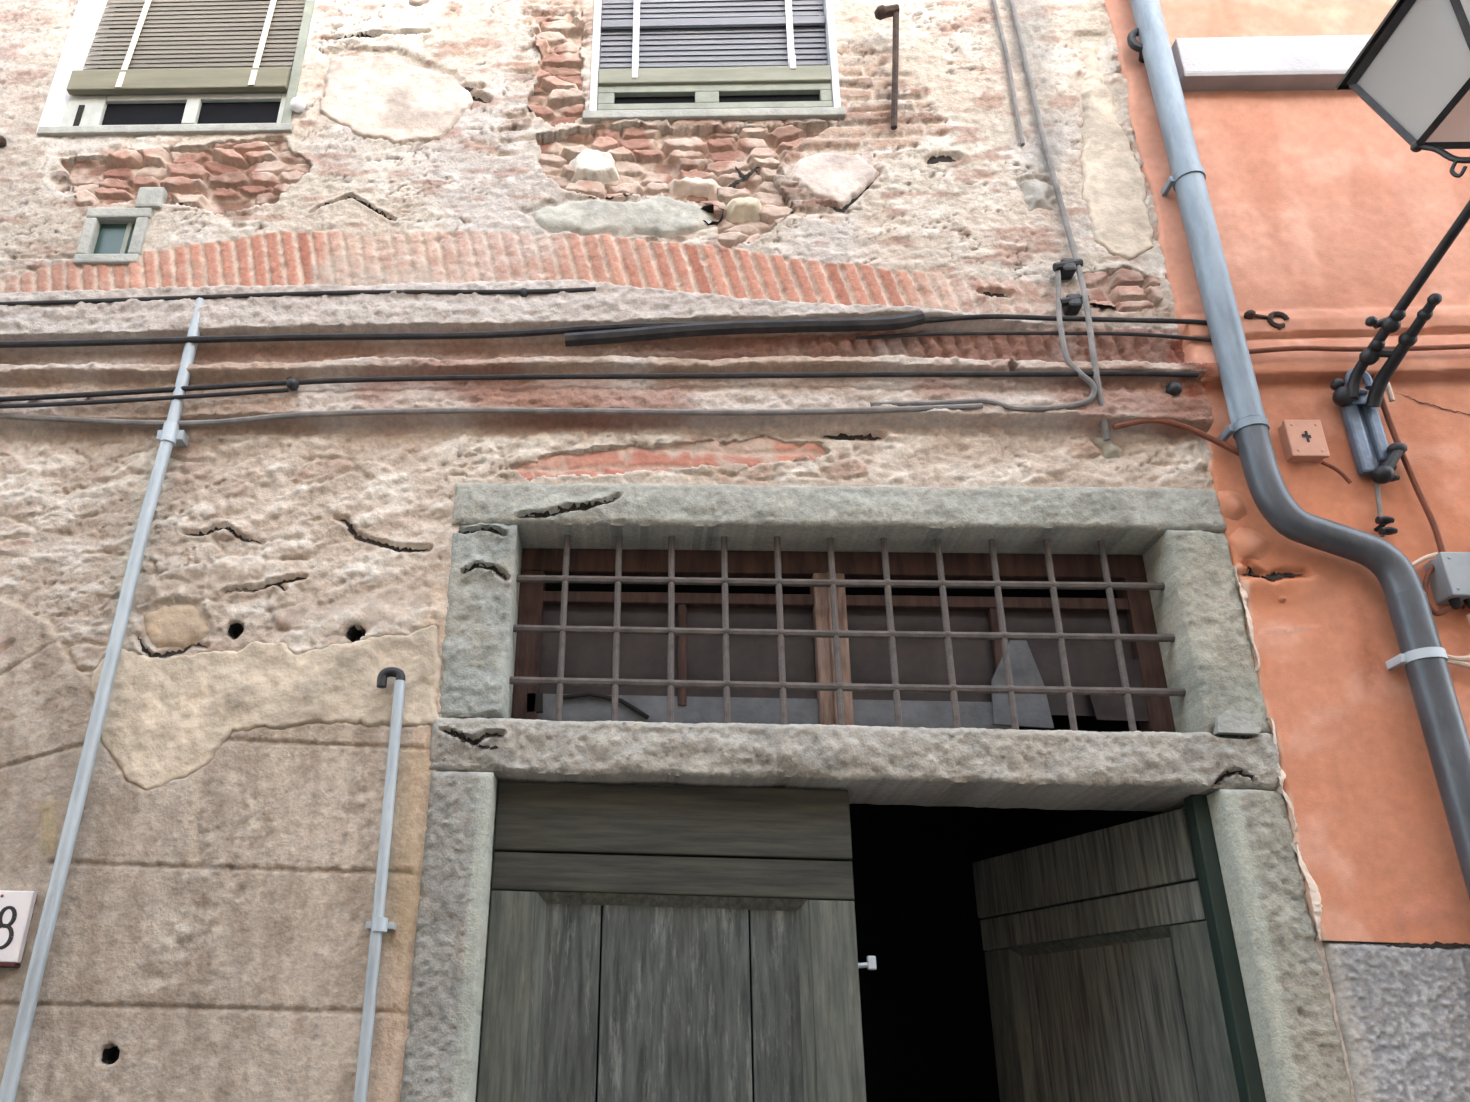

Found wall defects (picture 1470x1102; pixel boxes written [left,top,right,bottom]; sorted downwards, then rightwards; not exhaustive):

flaking render [527,11,879,249]
flaking render [61,141,311,215]
crack [186,526,262,544]
crack [339,519,428,553]
crack [458,498,617,580]
crack [225,577,307,593]
crack [1243,566,1304,580]
flaking render [1233,567,1260,671]
crack [443,729,503,750]
crack [1215,734,1254,784]
spalling [1211,709,1323,941]